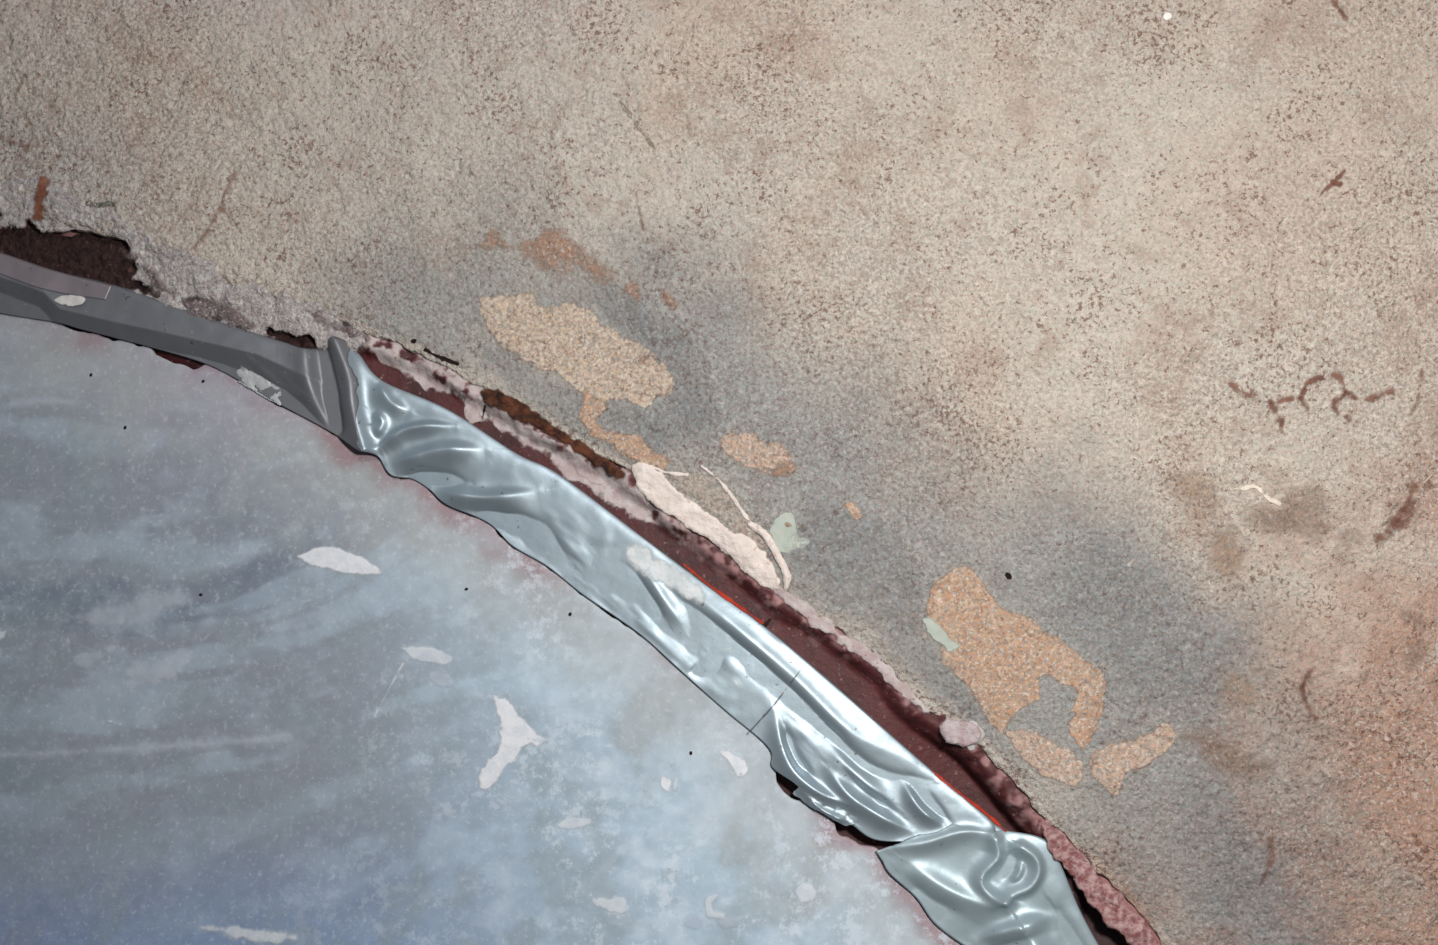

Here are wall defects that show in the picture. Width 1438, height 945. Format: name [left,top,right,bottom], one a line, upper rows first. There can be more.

rust [478,229,608,276]
spalling [0,176,930,712]
rust [480,389,625,478]
peeling [926,566,1177,795]